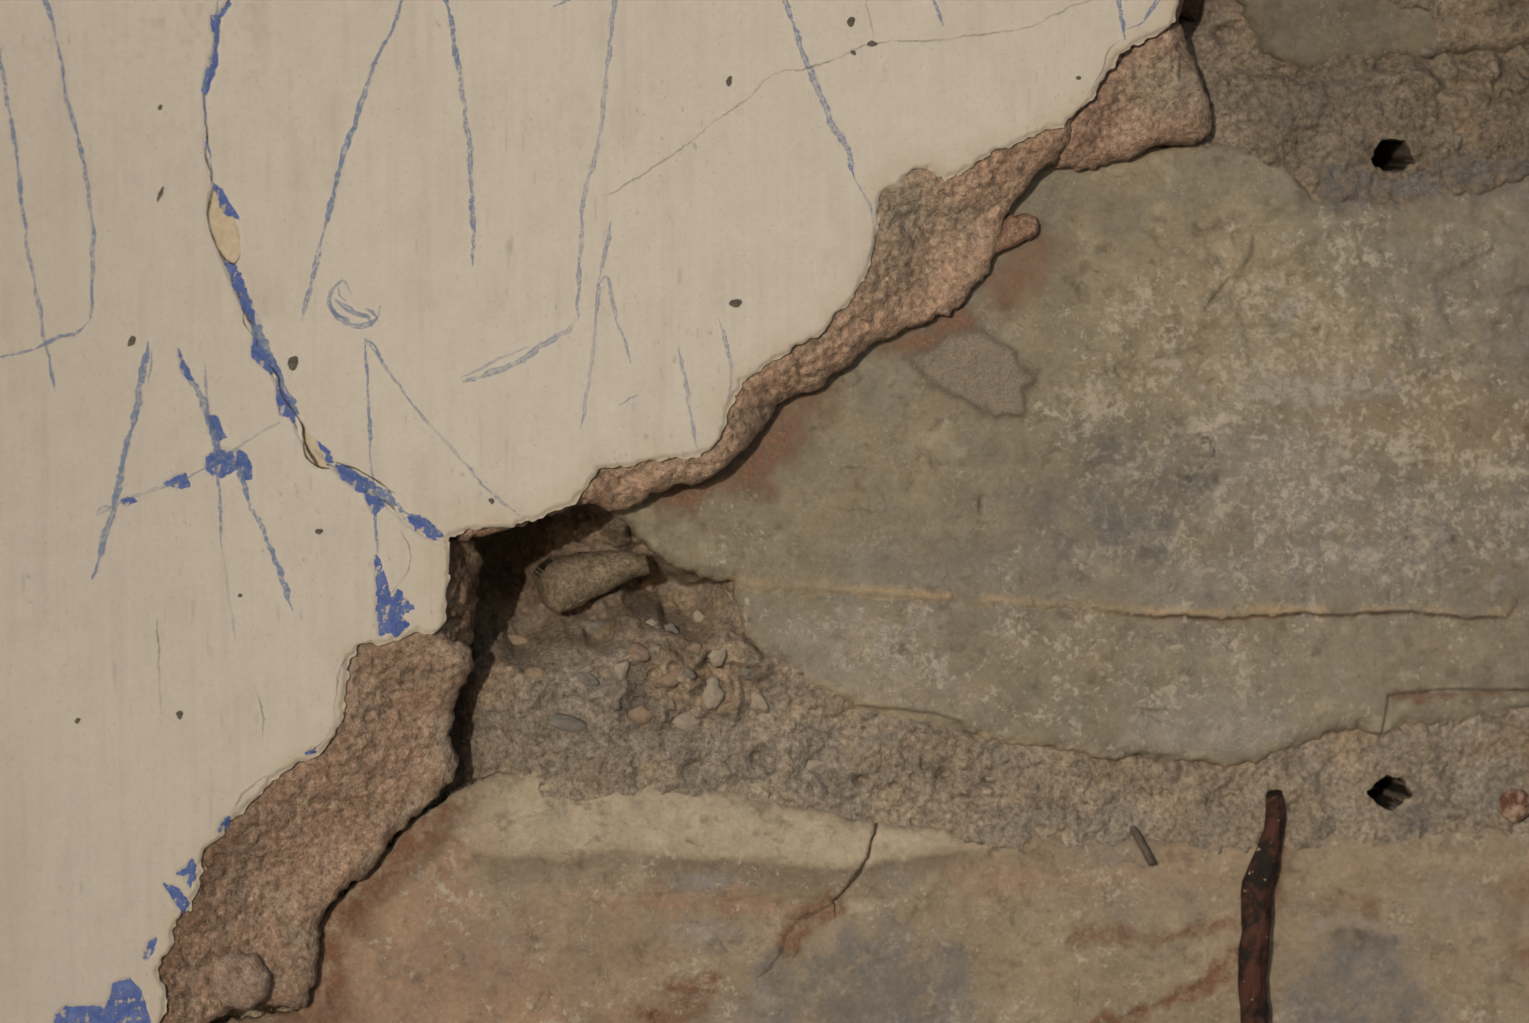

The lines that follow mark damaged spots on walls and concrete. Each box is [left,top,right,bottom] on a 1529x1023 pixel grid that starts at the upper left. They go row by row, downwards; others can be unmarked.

spalling [1162,0,1184,32]
crack [201,0,444,540]
spalling [545,113,1076,516]
peeling [178,351,194,381]
spalling [287,356,298,371]
peeling [206,415,253,480]
peeling [163,472,190,489]
spalling [54,521,528,1023]
crack [833,823,878,919]